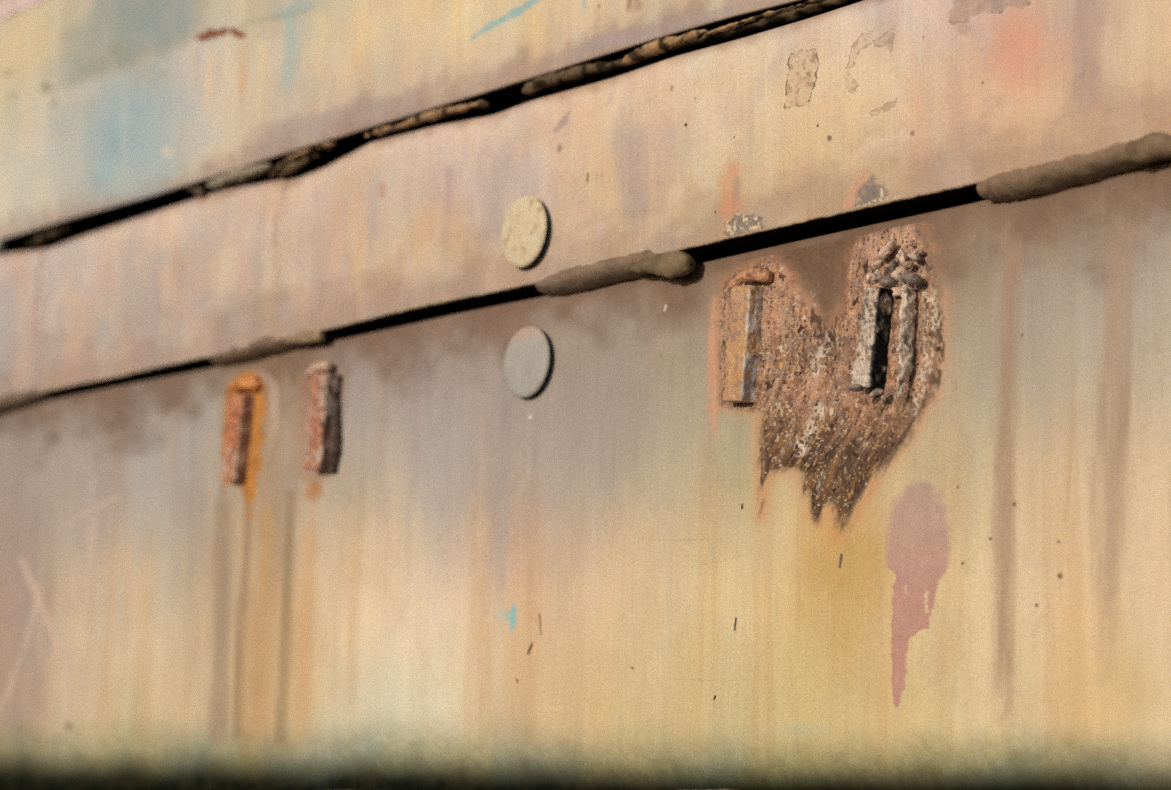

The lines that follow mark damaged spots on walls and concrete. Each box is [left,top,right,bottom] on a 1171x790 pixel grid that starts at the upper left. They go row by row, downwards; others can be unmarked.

peeling [783,48,820,110]
peeling [947,0,1031,39]
rust [203,367,324,748]
rust [697,220,962,701]
water stain [1061,190,1145,711]